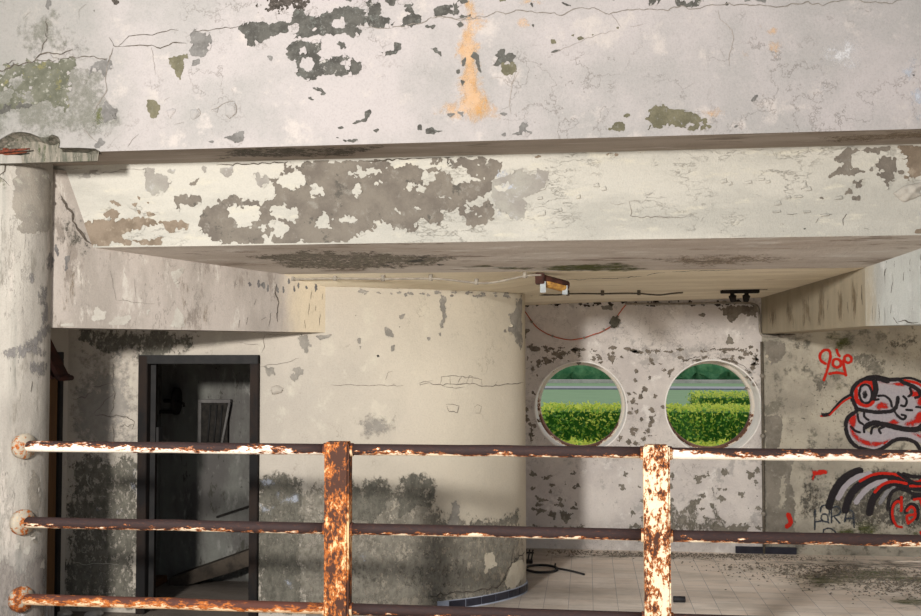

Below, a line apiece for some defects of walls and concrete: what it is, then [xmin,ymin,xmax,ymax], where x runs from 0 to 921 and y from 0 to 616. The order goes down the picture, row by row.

crack [0,11,240,110]
peeling [238,0,471,100]
corrosion [448,2,487,117]
crack [61,196,91,244]
peeling [84,155,563,247]
peeling [772,145,921,213]
damp [73,329,199,442]
peeling [617,369,668,446]
damp [66,452,137,519]
damp [352,473,519,526]
peeling [712,460,796,532]
damp [352,535,524,604]